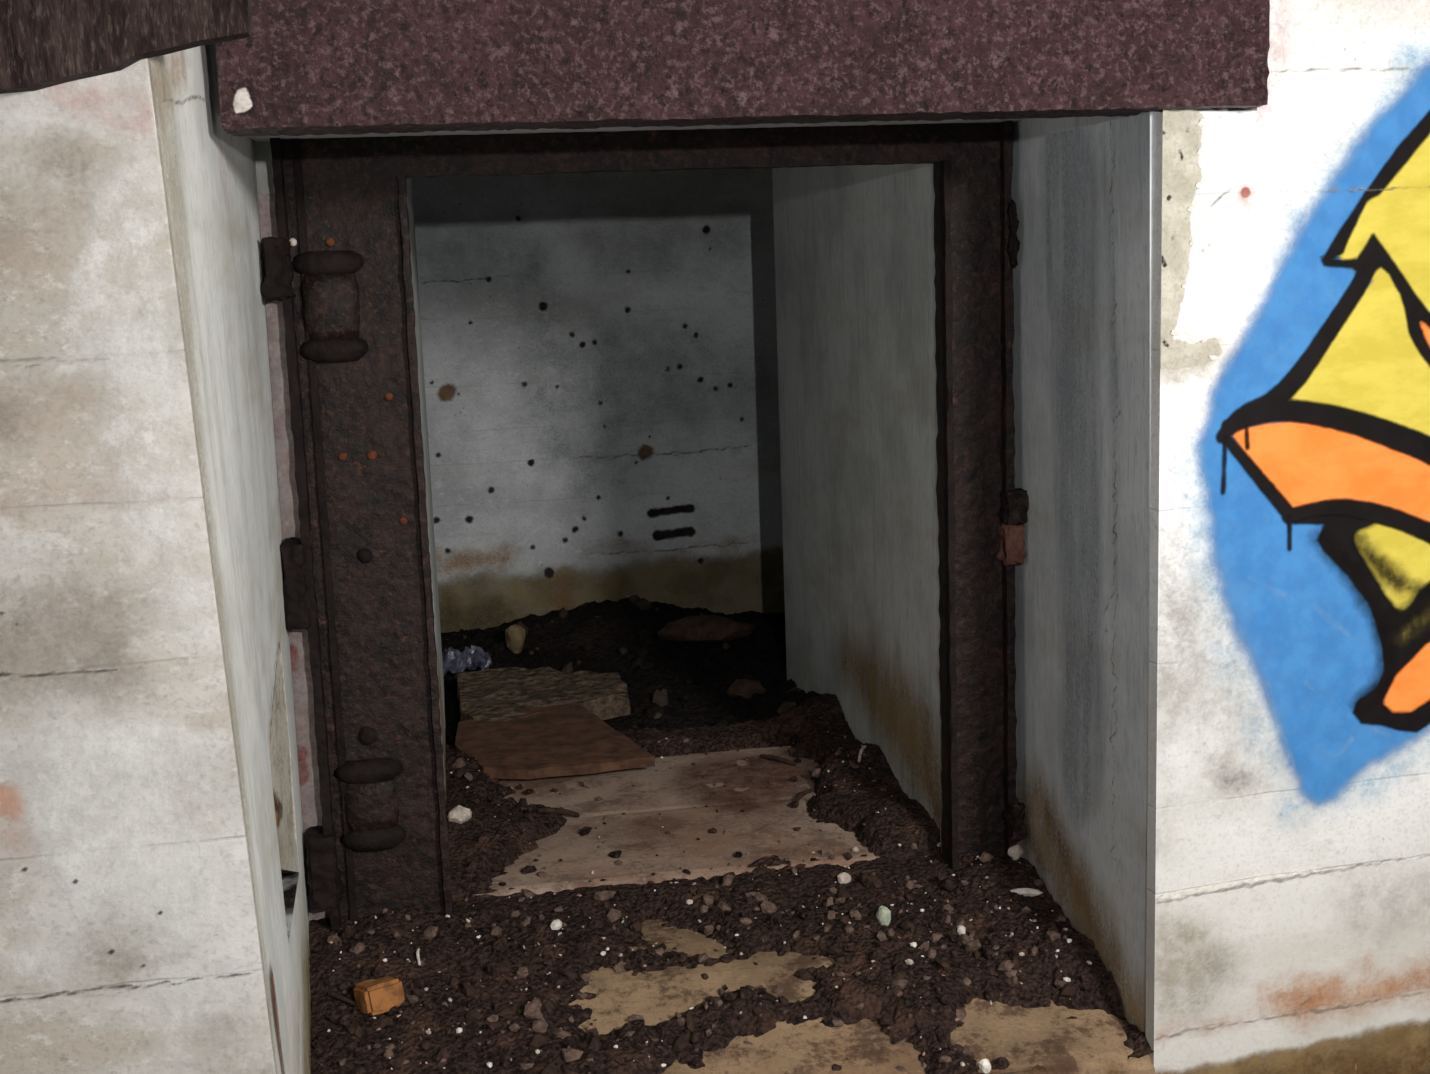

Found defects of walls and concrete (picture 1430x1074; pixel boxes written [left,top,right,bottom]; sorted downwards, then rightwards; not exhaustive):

peeling [1161,109,1222,380]
corrosion [273,792,283,826]
corrosion [271,968,285,1074]
leakage [1164,1021,1430,1074]
corrosion [1276,976,1429,1016]